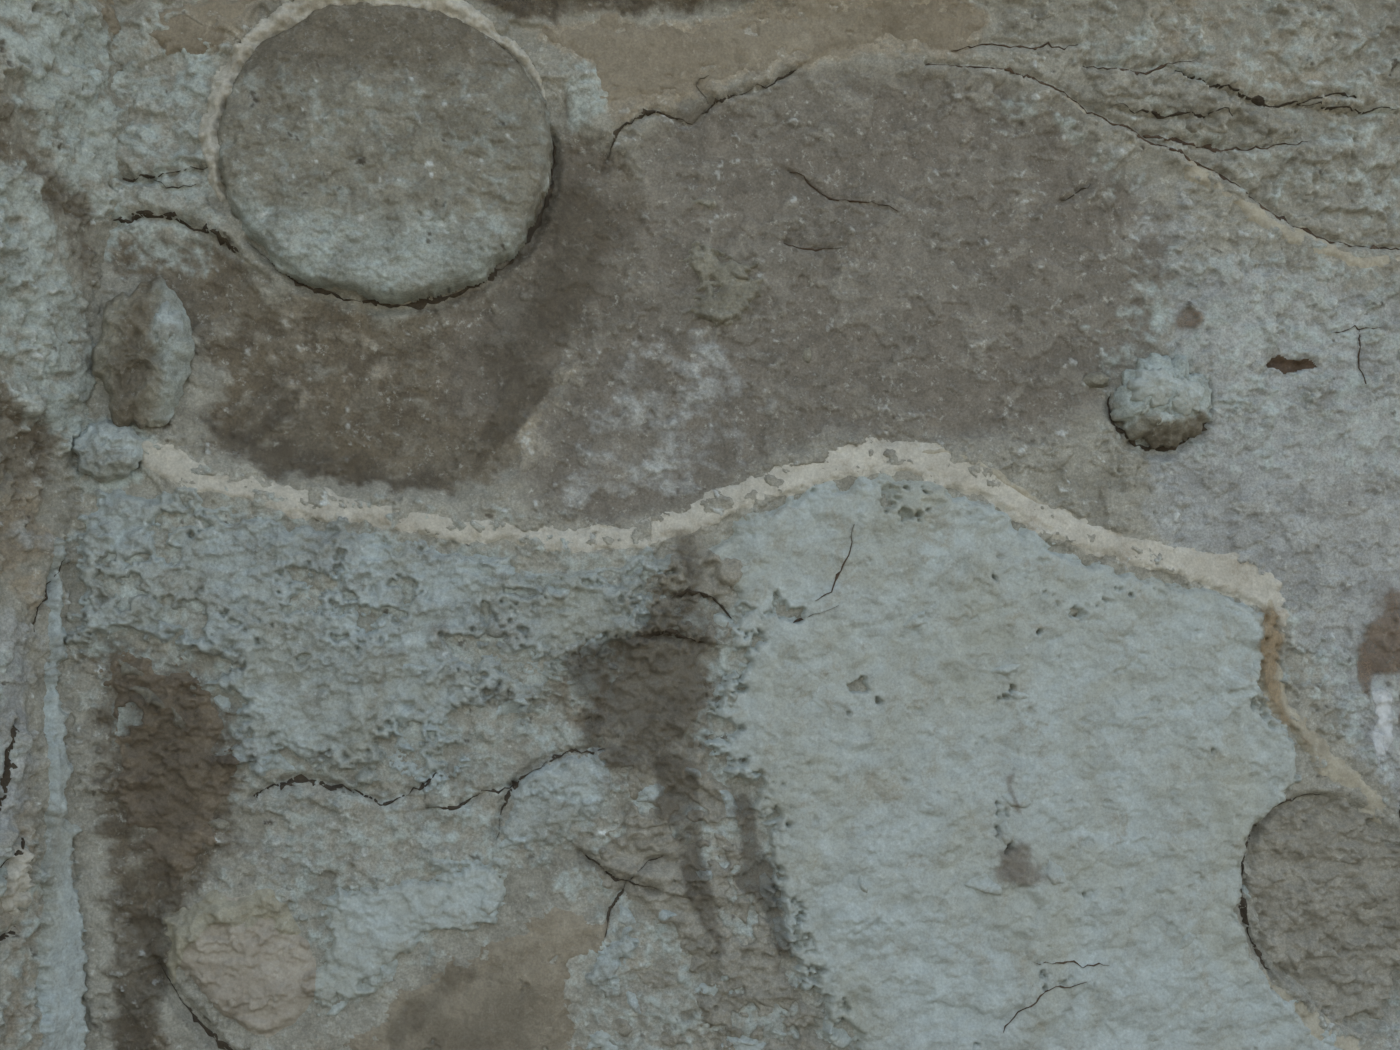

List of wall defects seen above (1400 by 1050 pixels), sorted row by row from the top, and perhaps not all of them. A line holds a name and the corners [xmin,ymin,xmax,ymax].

crack [607,70,796,159]
crack [926,42,1400,250]
peeling [1091,66,1301,141]
crack [789,172,898,212]
peeling [678,241,764,328]
peeling [1083,368,1204,425]
spalling [1266,355,1318,374]
crack [0,725,20,811]
crack [253,748,605,839]
peeling [0,473,1400,1050]
crack [0,837,25,868]
crack [585,855,662,936]